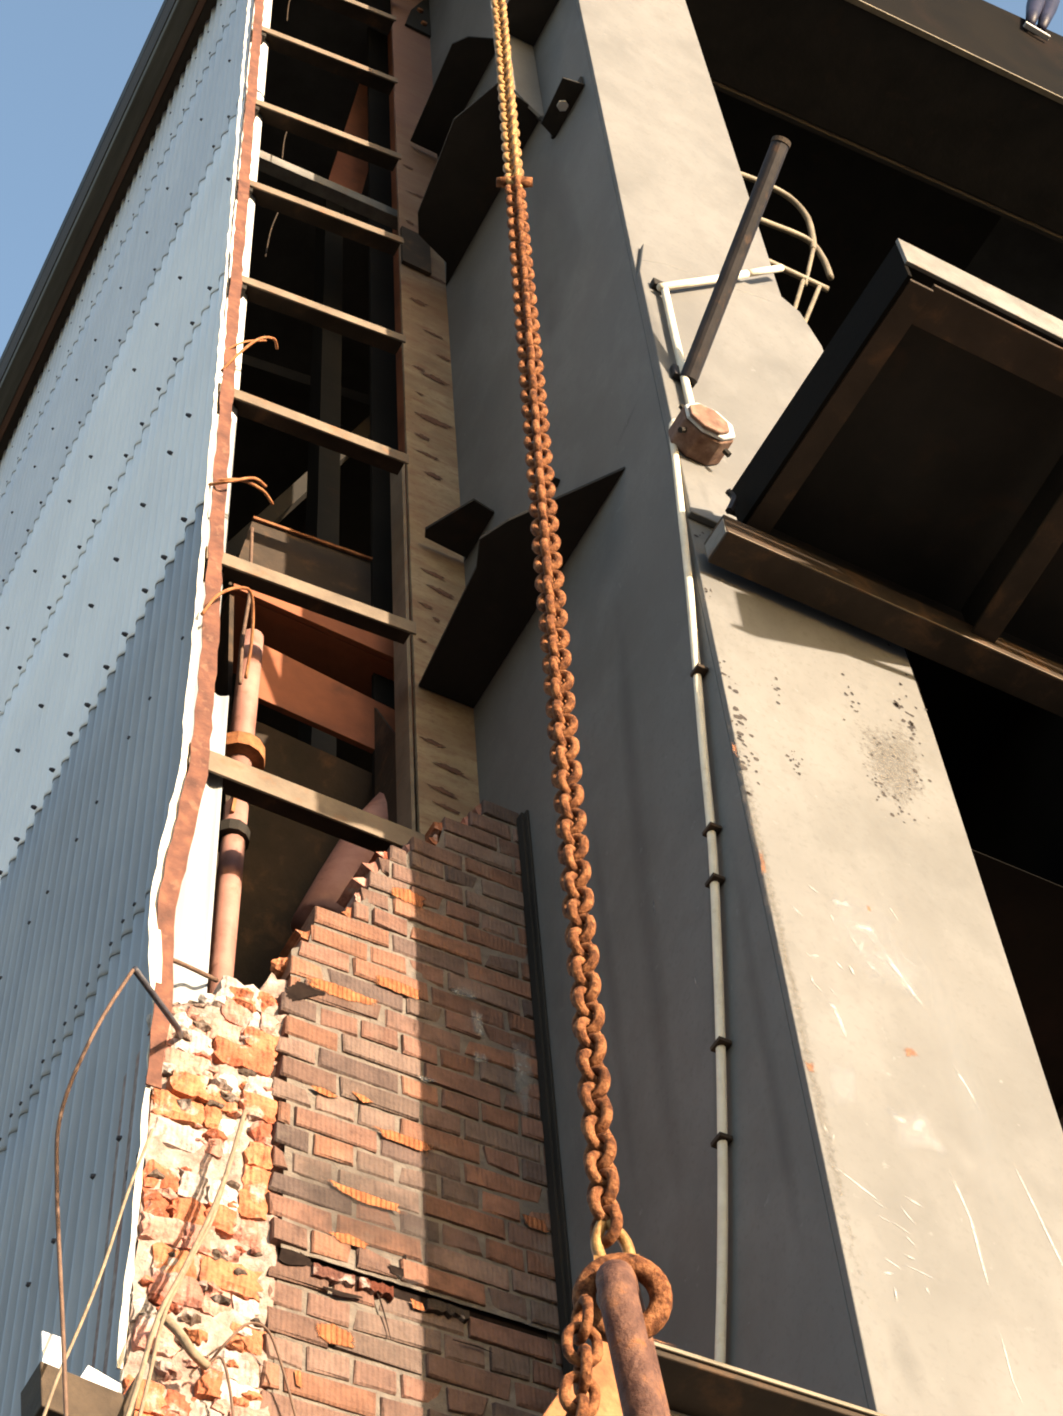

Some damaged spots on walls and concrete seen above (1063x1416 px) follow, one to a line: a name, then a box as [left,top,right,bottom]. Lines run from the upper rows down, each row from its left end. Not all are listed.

peeling [419,736,469,780]
rust [719,660,760,796]
rust [862,673,932,823]
spalling [336,784,482,918]
spalling [308,975,419,1005]
spalling [312,1086,374,1103]
spalling [374,1126,432,1151]
spalling [92,929,310,1416]
spalling [330,1180,400,1213]
spalling [330,1232,367,1249]
crack [278,1247,548,1353]
spalling [316,1323,355,1348]